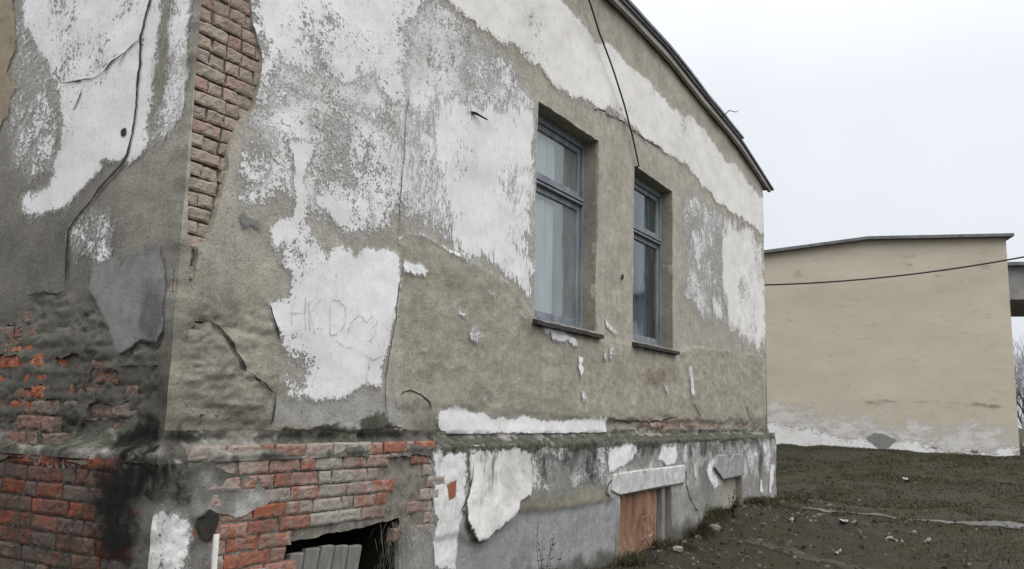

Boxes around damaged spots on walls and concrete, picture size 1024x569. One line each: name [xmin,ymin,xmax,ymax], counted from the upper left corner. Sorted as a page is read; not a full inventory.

crack [27,0,151,296]
peeling [9,0,766,402]
crack [399,88,410,220]
flaking render [0,311,140,569]
leakage [88,412,190,567]
crack [193,275,432,434]
flaking render [148,397,1020,569]
leakage [767,400,1016,456]